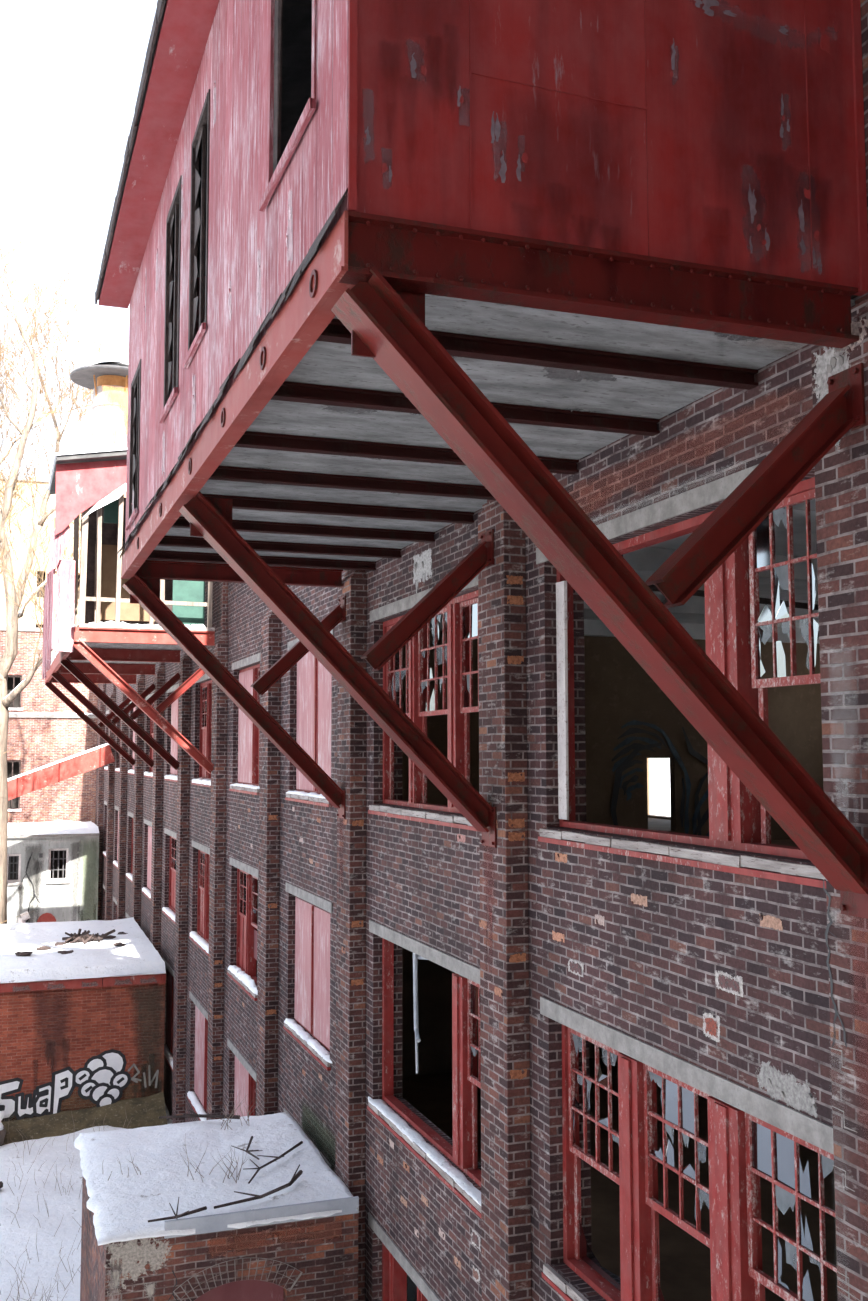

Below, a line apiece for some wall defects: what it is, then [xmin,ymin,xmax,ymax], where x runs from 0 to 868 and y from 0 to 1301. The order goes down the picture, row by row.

peeling [694,0,737,17]
peeling [491,111,528,183]
peeling [748,184,770,253]
peeling [798,188,822,274]
leakage [134,987,163,1098]
spalling [104,1237,172,1298]